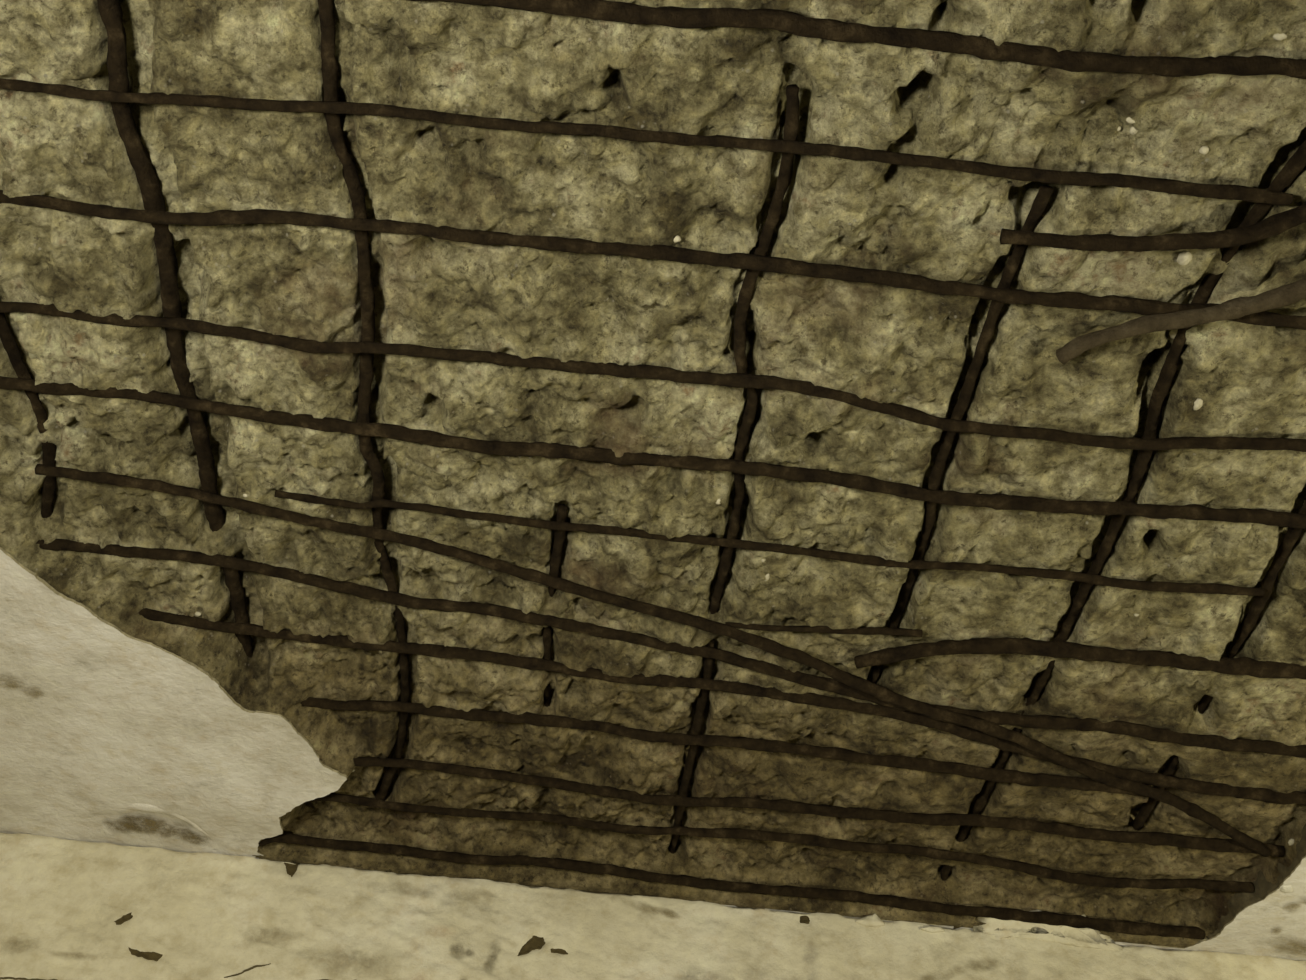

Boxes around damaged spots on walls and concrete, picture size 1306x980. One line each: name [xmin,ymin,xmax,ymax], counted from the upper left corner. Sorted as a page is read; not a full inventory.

spalling [0,0,1306,439]
spalling [0,301,1306,951]
crack [0,972,57,980]
crack [224,963,271,978]